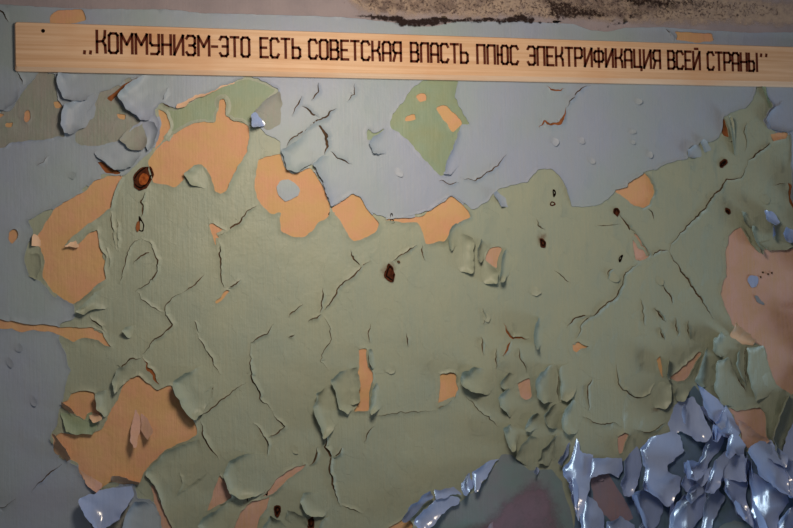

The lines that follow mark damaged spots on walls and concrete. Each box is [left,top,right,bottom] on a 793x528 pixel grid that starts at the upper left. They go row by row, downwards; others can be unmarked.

damp [352,0,793,27]
crack [537,84,592,132]
peeling [716,116,732,141]
peeling [0,71,512,351]
crack [565,122,773,345]
peeling [51,363,215,528]
crack [102,192,427,498]
crack [309,429,363,516]
crack [369,395,500,428]
peeling [382,459,499,528]
crack [556,364,667,436]
peeling [434,210,793,528]